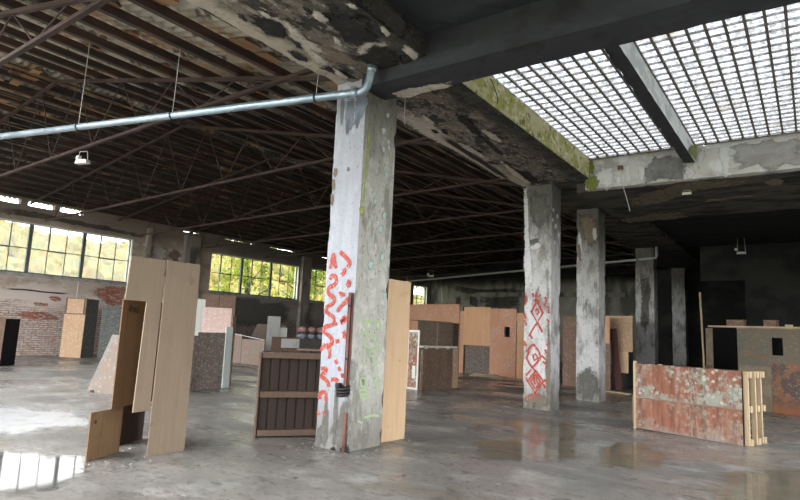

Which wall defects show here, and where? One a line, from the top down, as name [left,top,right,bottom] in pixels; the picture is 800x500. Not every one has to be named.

peeling [258,11,348,79]
spalling [357,26,418,70]
peeling [387,109,532,185]
peeling [644,156,686,183]
peeling [731,138,800,170]
flaking render [16,296,61,320]
flaking render [95,286,126,306]
leakage [577,367,599,401]